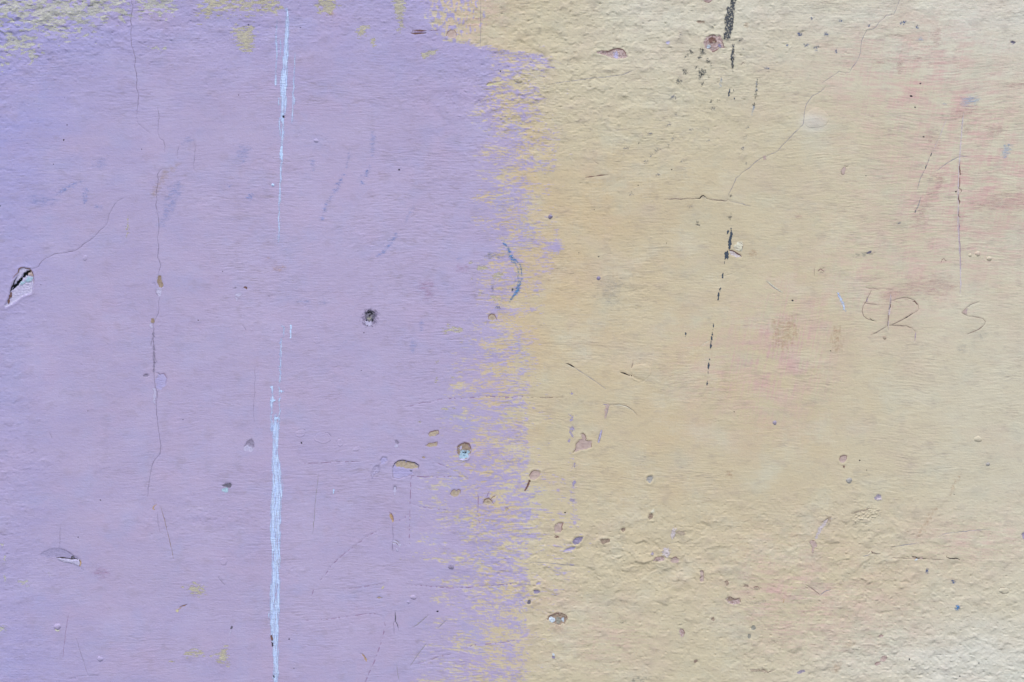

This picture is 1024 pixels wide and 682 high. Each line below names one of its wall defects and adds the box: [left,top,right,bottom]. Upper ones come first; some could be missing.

peeling [597,48,628,59]
spalling [703,34,727,52]
crack [671,0,900,206]
crack [130,1,195,274]
spalling [4,267,34,307]
flaking render [365,310,376,326]
crack [148,302,161,487]
peeling [392,430,439,495]
peeling [40,547,81,567]